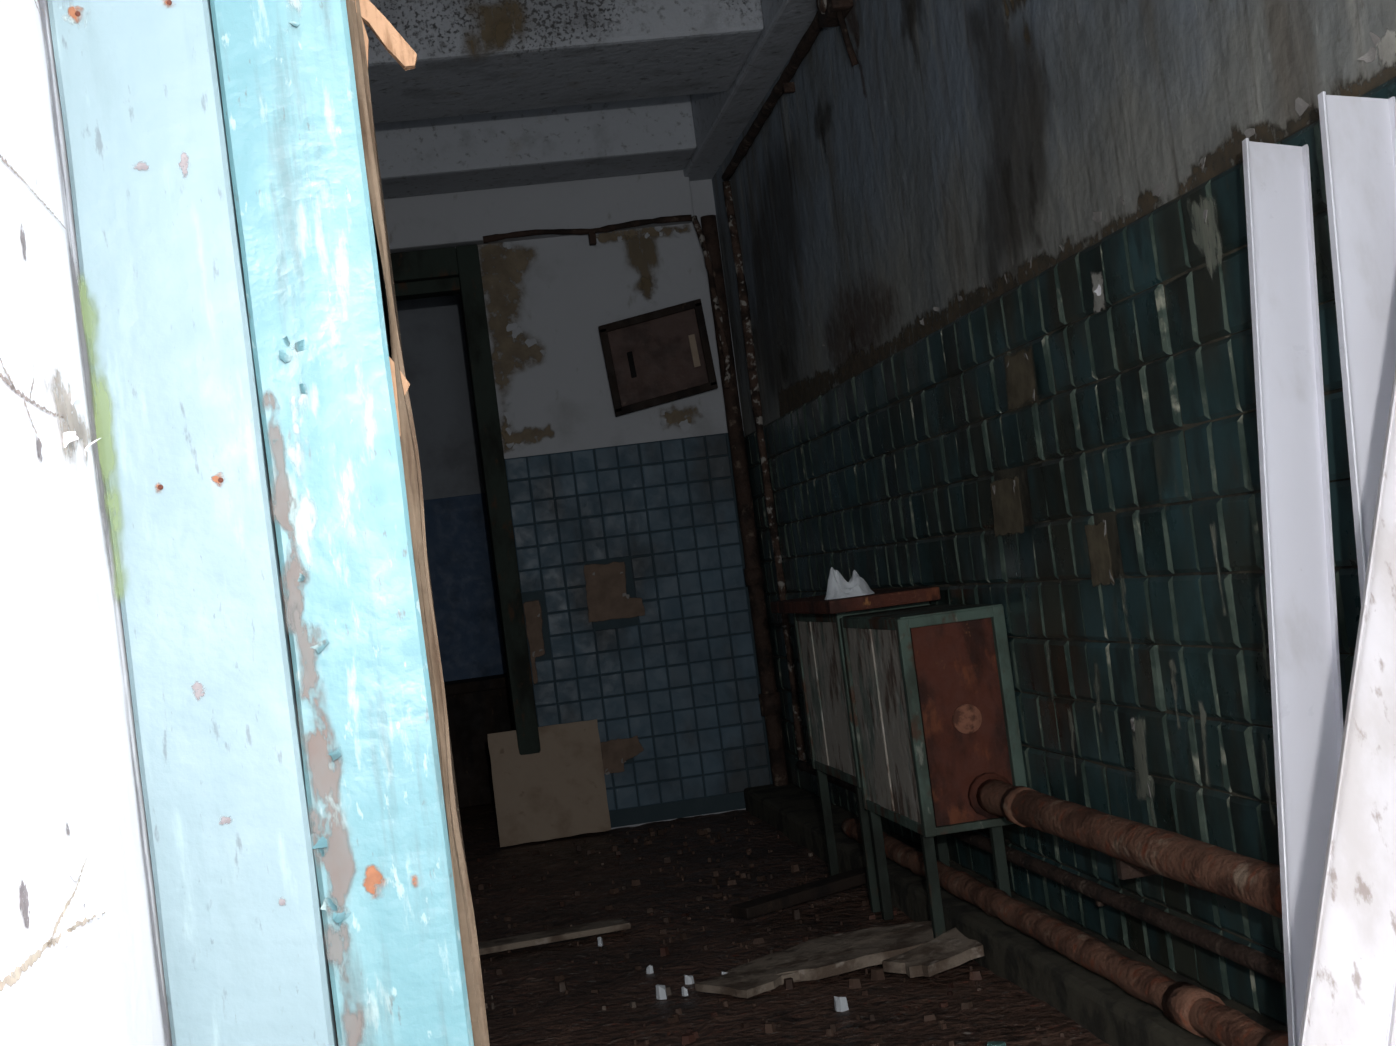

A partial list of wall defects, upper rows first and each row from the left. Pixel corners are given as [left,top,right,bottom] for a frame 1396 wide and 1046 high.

peeling [593,225,689,248]
crack [0,349,64,445]
peeling [279,336,310,363]
peeling [480,242,554,452]
peeling [584,562,645,622]
peeling [264,383,364,1046]
crack [0,858,106,991]